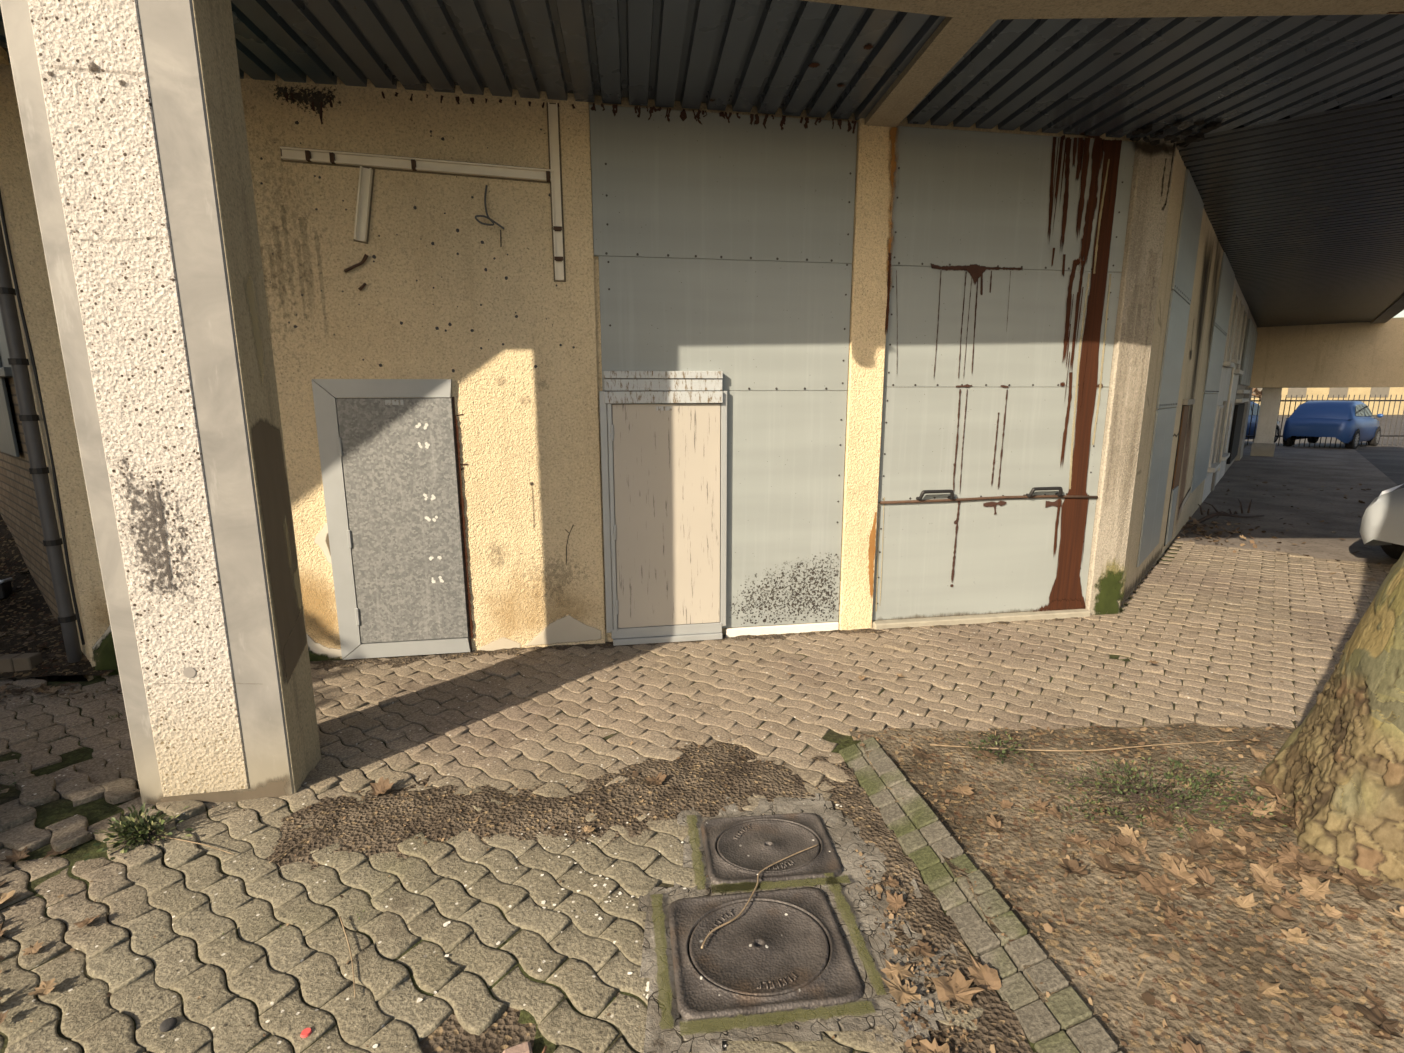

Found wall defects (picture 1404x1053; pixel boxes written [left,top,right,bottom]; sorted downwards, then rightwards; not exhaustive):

corrosion [931,263,1023,587]
corrosion [1033,132,1122,612]